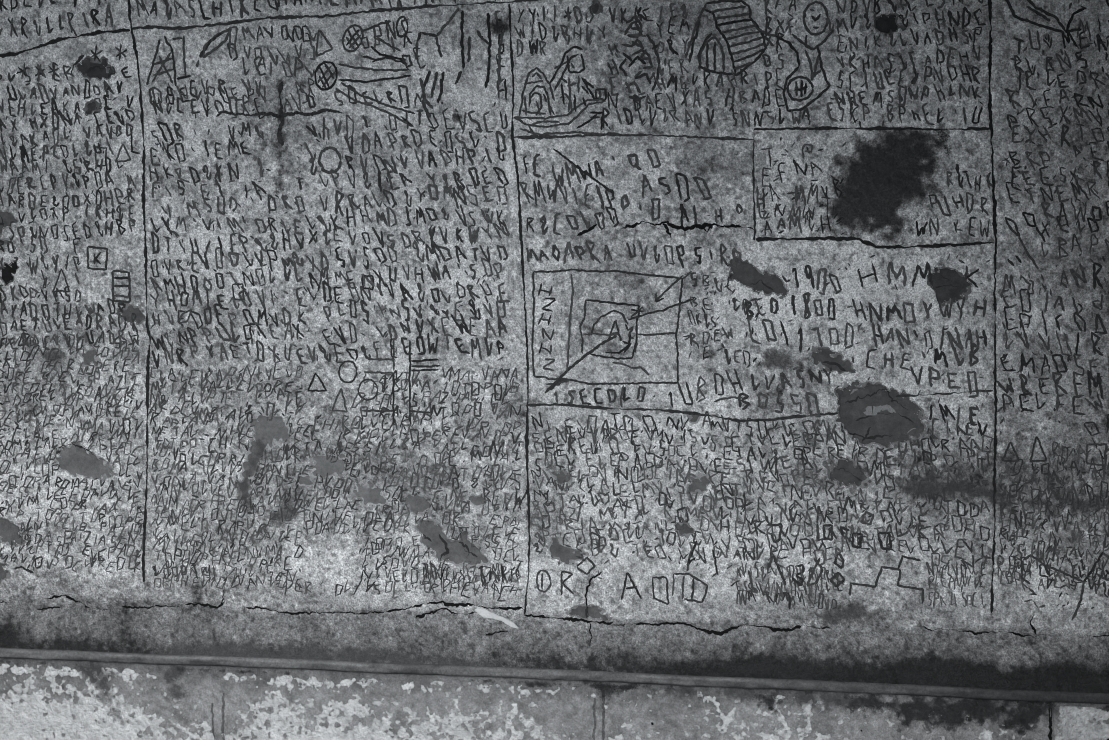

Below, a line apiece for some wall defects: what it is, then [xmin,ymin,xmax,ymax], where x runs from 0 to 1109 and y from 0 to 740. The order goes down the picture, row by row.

leakage [821,125,949,244]
crack [37,566,830,646]
crack [924,615,1044,637]